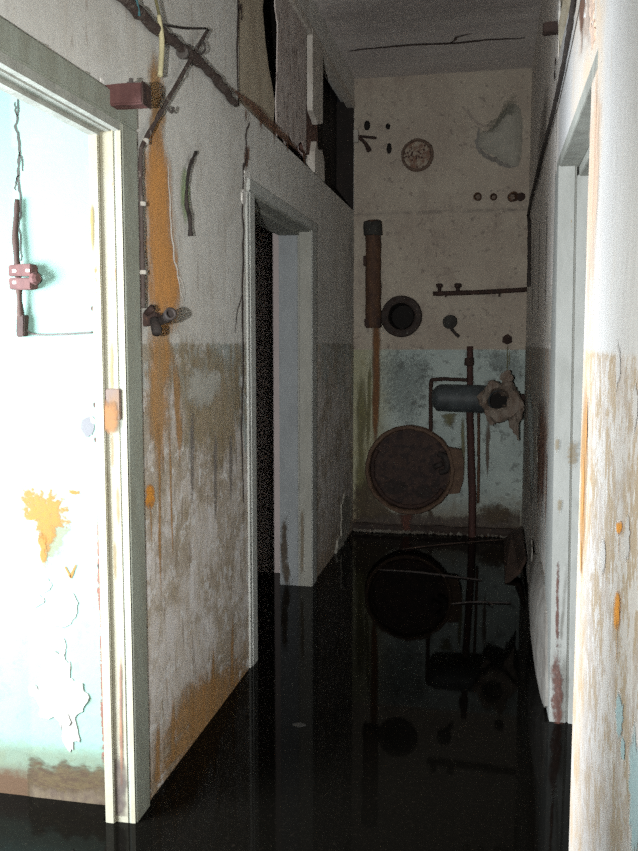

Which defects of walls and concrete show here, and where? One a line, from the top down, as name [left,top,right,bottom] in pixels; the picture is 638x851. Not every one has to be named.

crack [351,34,525,51]
water stain [181,346,240,511]
water stain [354,384,520,528]
rust [537,406,559,522]
peeling [28,639,90,752]
peeling [96,520,104,763]
rust [550,563,563,724]
peeling [615,694,638,851]